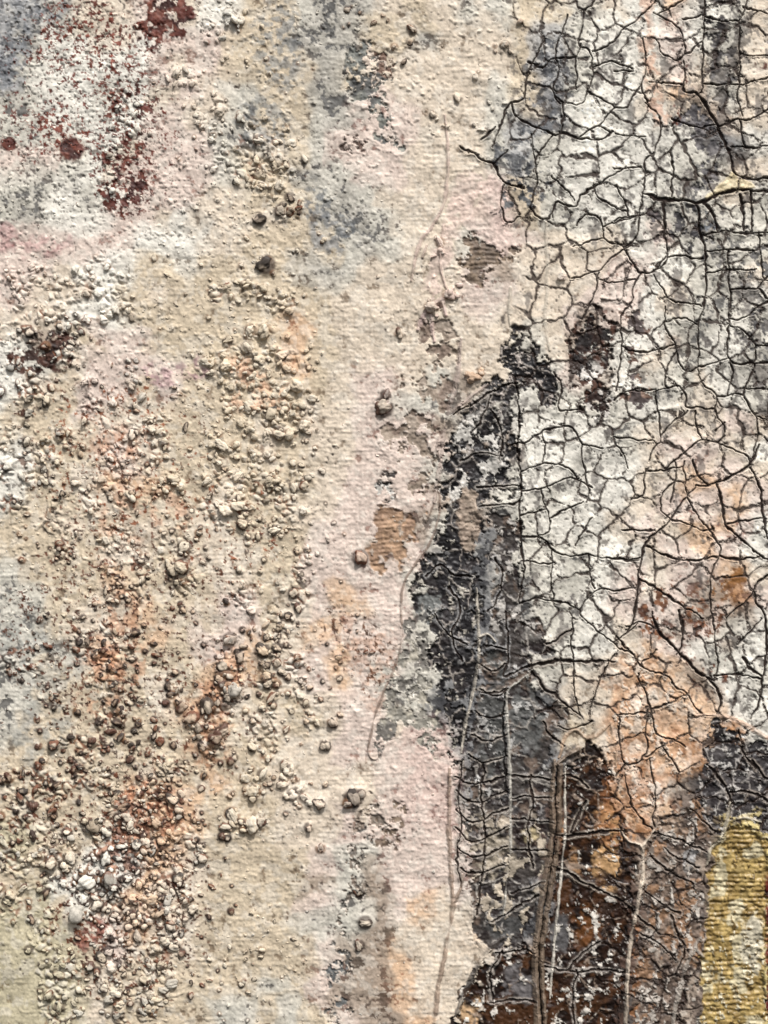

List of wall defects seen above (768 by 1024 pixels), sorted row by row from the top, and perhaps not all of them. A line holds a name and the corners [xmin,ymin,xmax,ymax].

corrosion [26,0,197,212]
spalling [365,305,768,1024]
crack [424,0,768,1024]